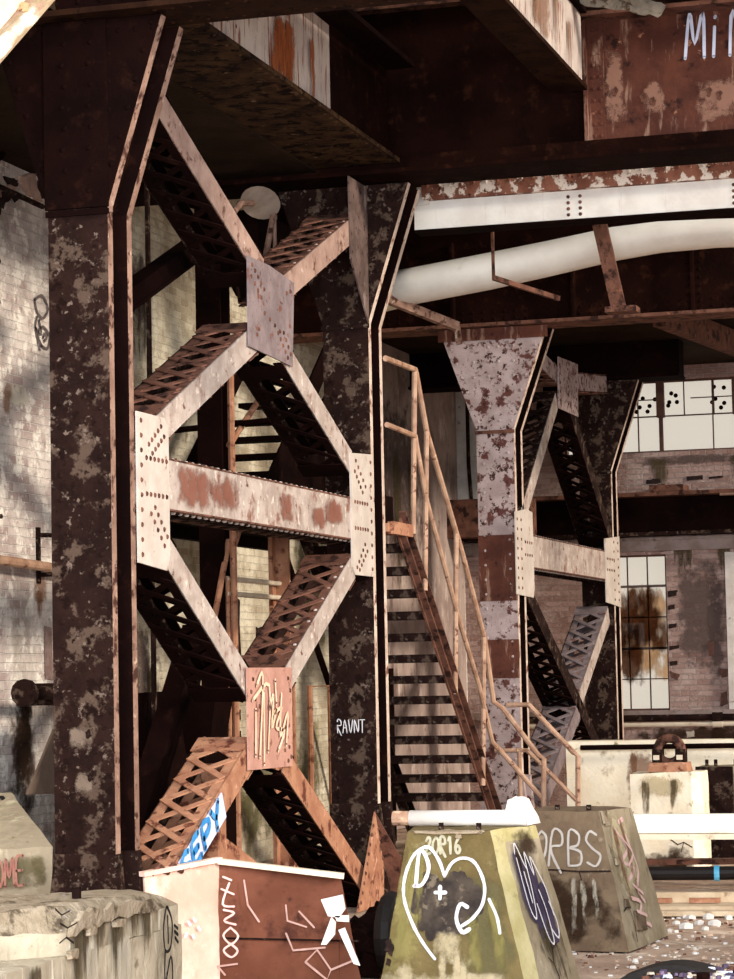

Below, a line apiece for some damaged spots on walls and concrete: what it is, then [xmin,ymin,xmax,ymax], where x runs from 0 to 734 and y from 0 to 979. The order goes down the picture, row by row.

rust [271,17,295,82]
spalling [0,173,44,203]
rust [179,467,239,510]
rust [280,494,295,520]
rust [313,498,342,529]